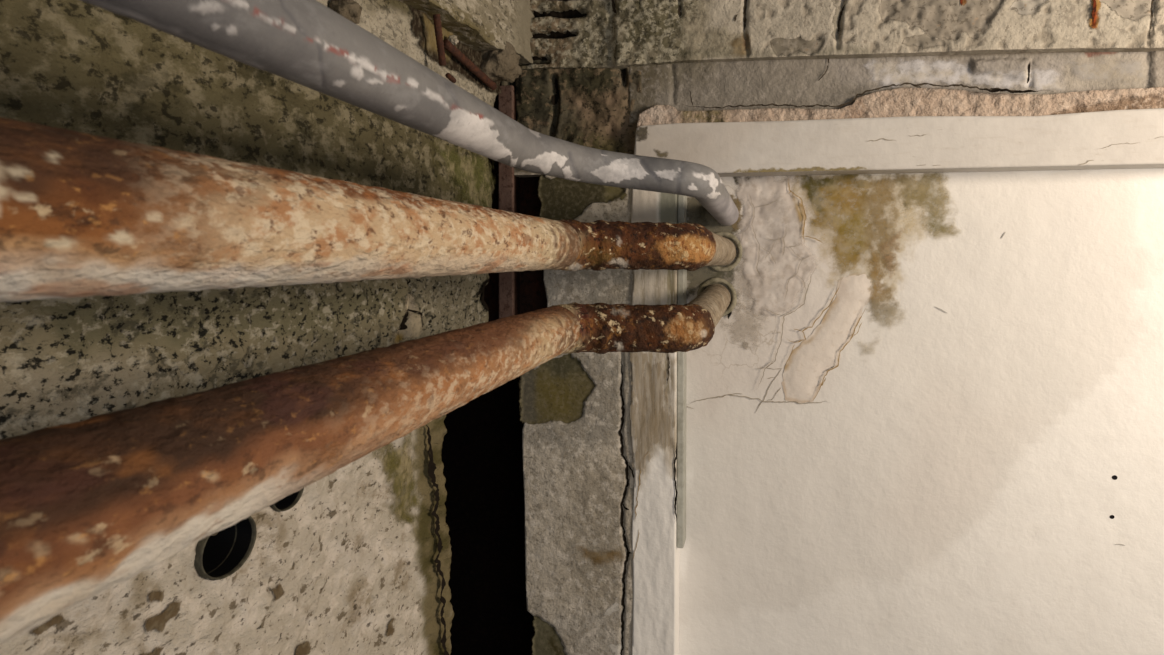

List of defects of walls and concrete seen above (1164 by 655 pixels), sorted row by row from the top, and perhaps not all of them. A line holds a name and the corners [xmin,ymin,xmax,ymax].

peeling [770,0,845,56]
crack [679,5,1050,109]
peeling [879,0,1047,49]
damp [865,59,1065,90]
corrosion [1090,0,1101,28]
peeling [1099,0,1156,21]
damp [687,167,954,324]
crack [686,183,865,413]
crack [426,425,449,655]
crack [619,352,678,655]